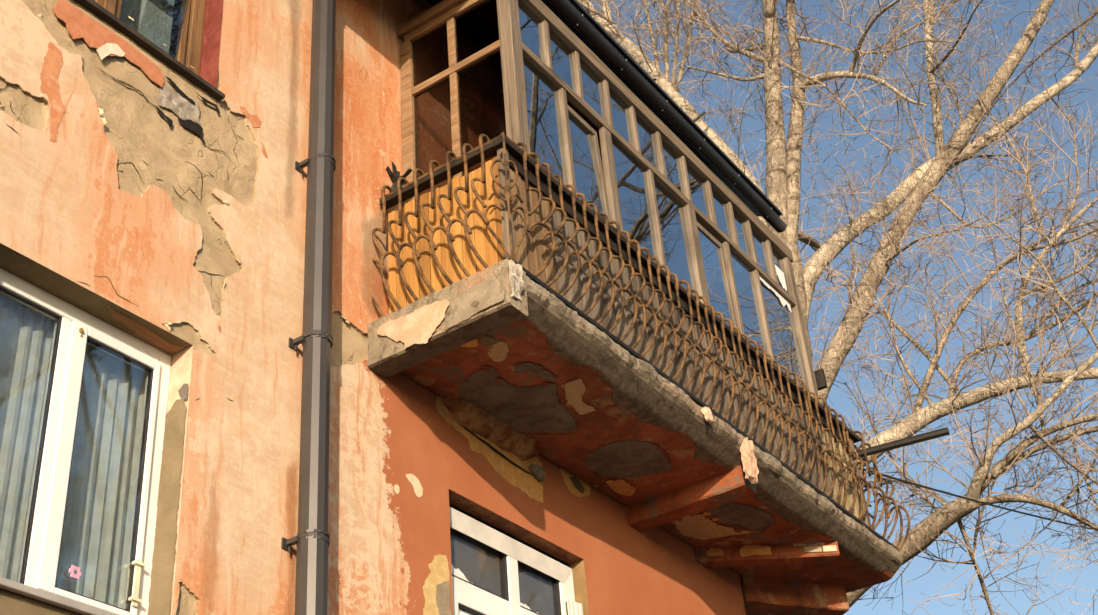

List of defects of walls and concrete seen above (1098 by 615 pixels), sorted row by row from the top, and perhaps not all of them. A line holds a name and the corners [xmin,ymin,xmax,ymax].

spalling [0,0,268,316]
spalling [162,322,216,356]
peeling [330,259,524,367]
spalling [458,339,596,433]
spalling [701,406,713,424]
peeling [394,474,423,497]
peeling [435,396,543,503]
spalling [560,440,672,497]
spalling [740,437,759,484]
spalling [671,502,776,557]
spalling [176,582,200,615]
peeling [423,554,452,615]